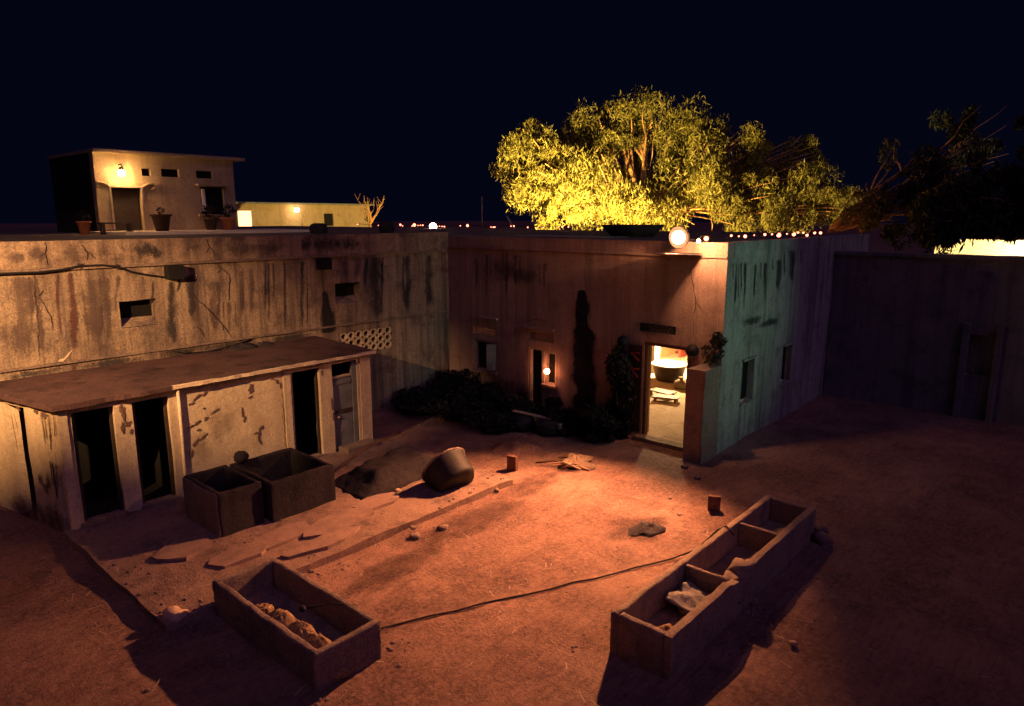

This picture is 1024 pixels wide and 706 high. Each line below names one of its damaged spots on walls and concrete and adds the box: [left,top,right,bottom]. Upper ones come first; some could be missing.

damp [11,249,45,263]
damp [12,277,44,356]
crack [34,243,53,356]
damp [83,277,120,339]
damp [133,243,161,258]
crack [193,240,232,337]
damp [165,238,384,356]
damp [733,246,802,301]
peeling [187,391,219,458]